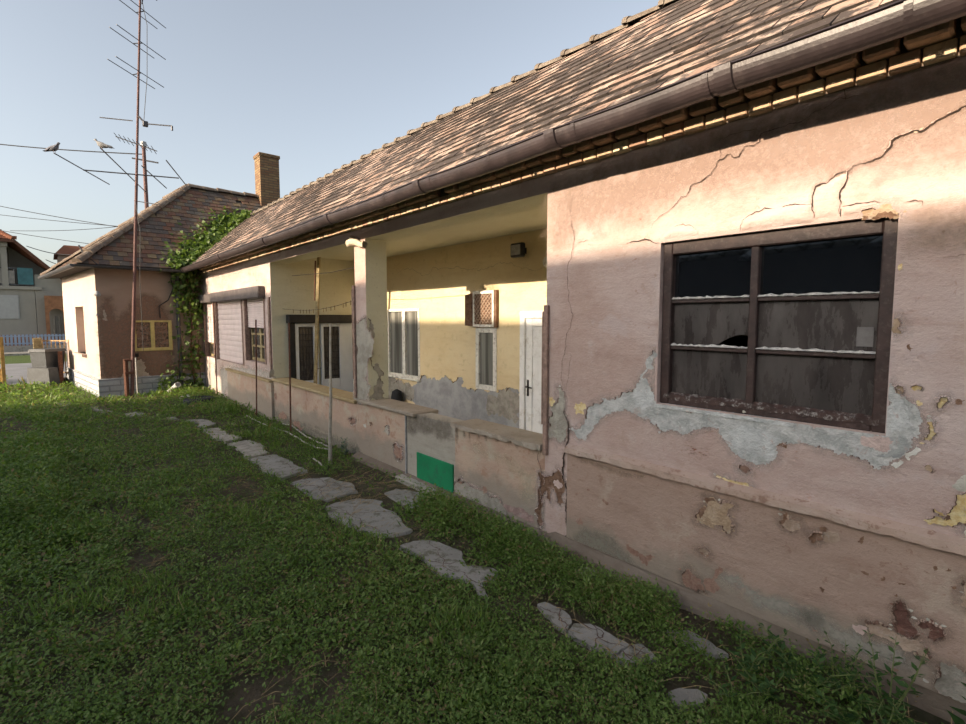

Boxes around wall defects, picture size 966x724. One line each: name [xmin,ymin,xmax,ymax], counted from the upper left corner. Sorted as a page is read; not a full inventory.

crack [629,90,860,243]
crack [740,105,966,230]
spalling [353,317,384,405]
crack [537,190,586,537]
spalling [548,350,965,487]
spalling [453,469,590,530]
spalling [695,497,735,535]
peeling [924,475,966,535]
spalling [852,582,966,703]